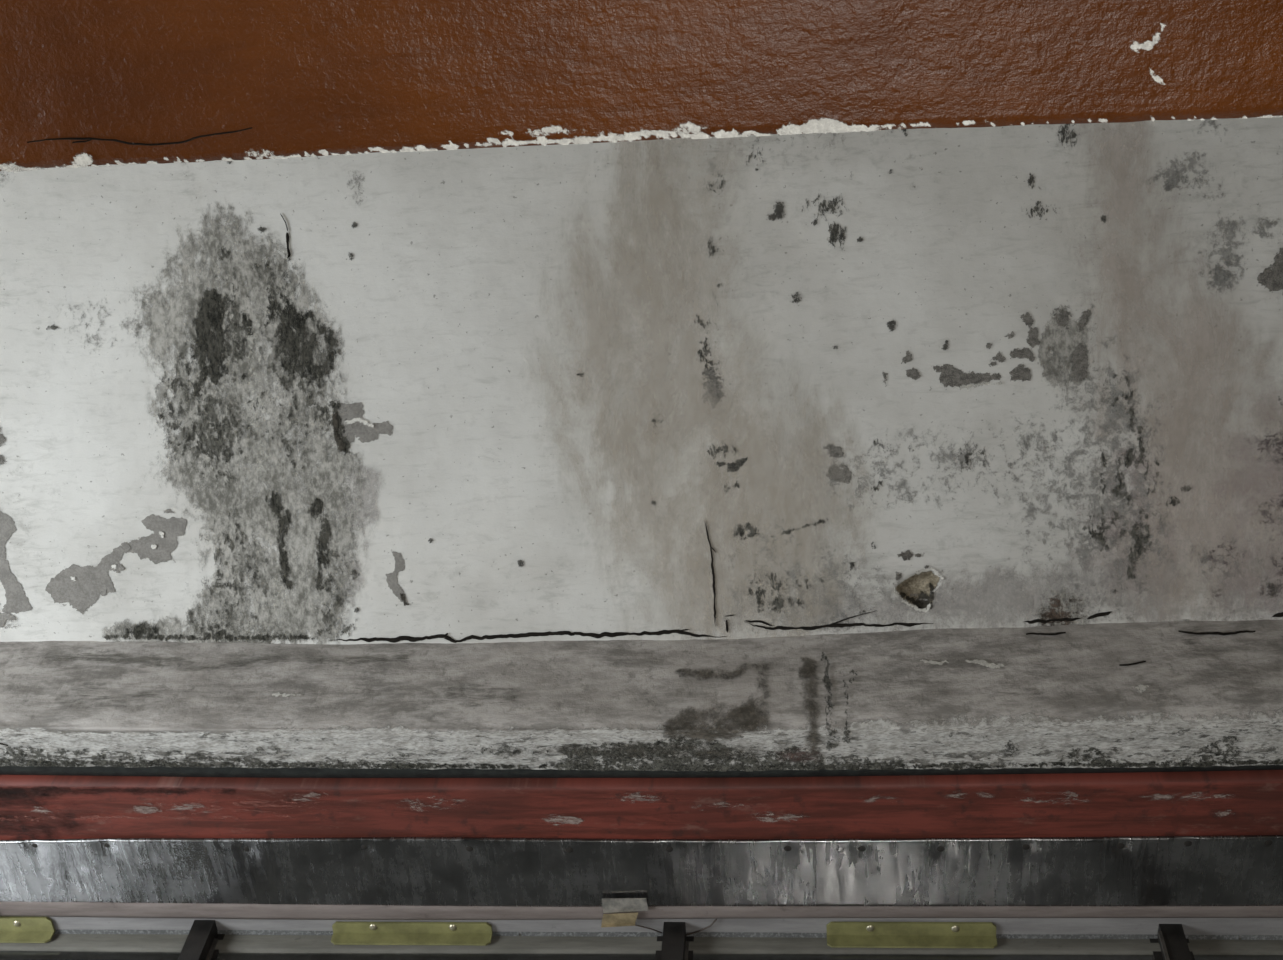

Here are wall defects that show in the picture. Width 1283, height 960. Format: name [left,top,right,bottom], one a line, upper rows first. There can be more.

peeling [1130,23,1166,52]
peeling [0,153,204,172]
peeling [222,118,931,161]
damp [802,195,863,249]
damp [1199,219,1283,292]
peeling [902,306,1093,389]
damp [62,204,408,669]
damp [914,239,1283,627]
peeling [0,511,32,629]
peeling [45,509,187,614]
crack [329,521,933,643]
damp [0,652,1283,772]